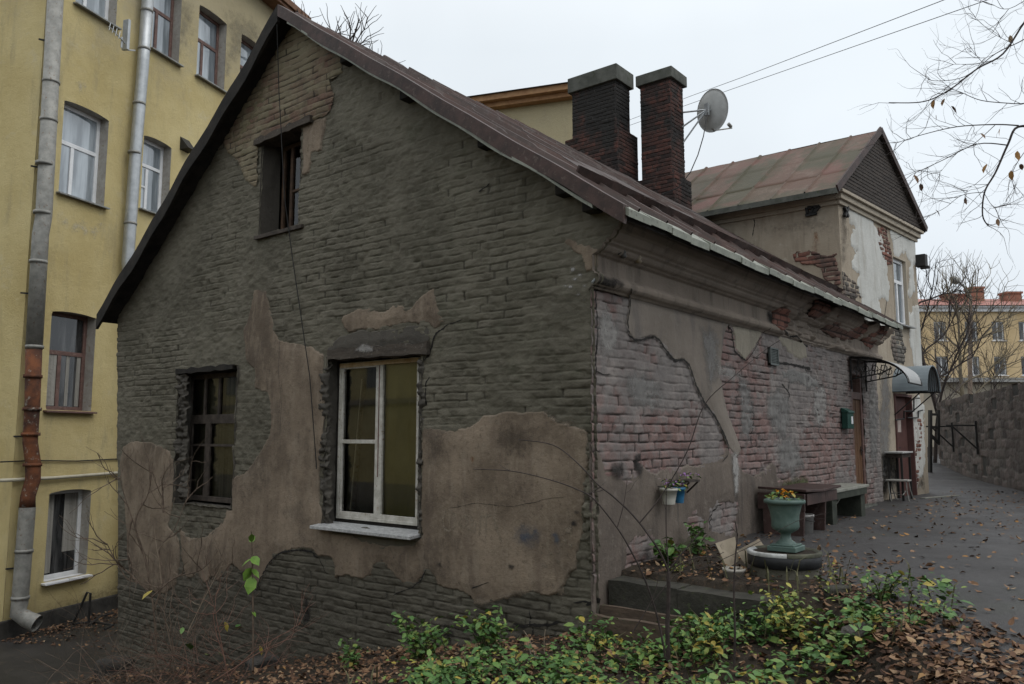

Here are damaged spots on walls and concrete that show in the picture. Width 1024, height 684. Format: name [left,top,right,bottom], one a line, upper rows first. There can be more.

peeling [224,26,343,187]
peeling [793,210,922,366]
spalling [173,374,191,500]
crack [594,289,754,461]